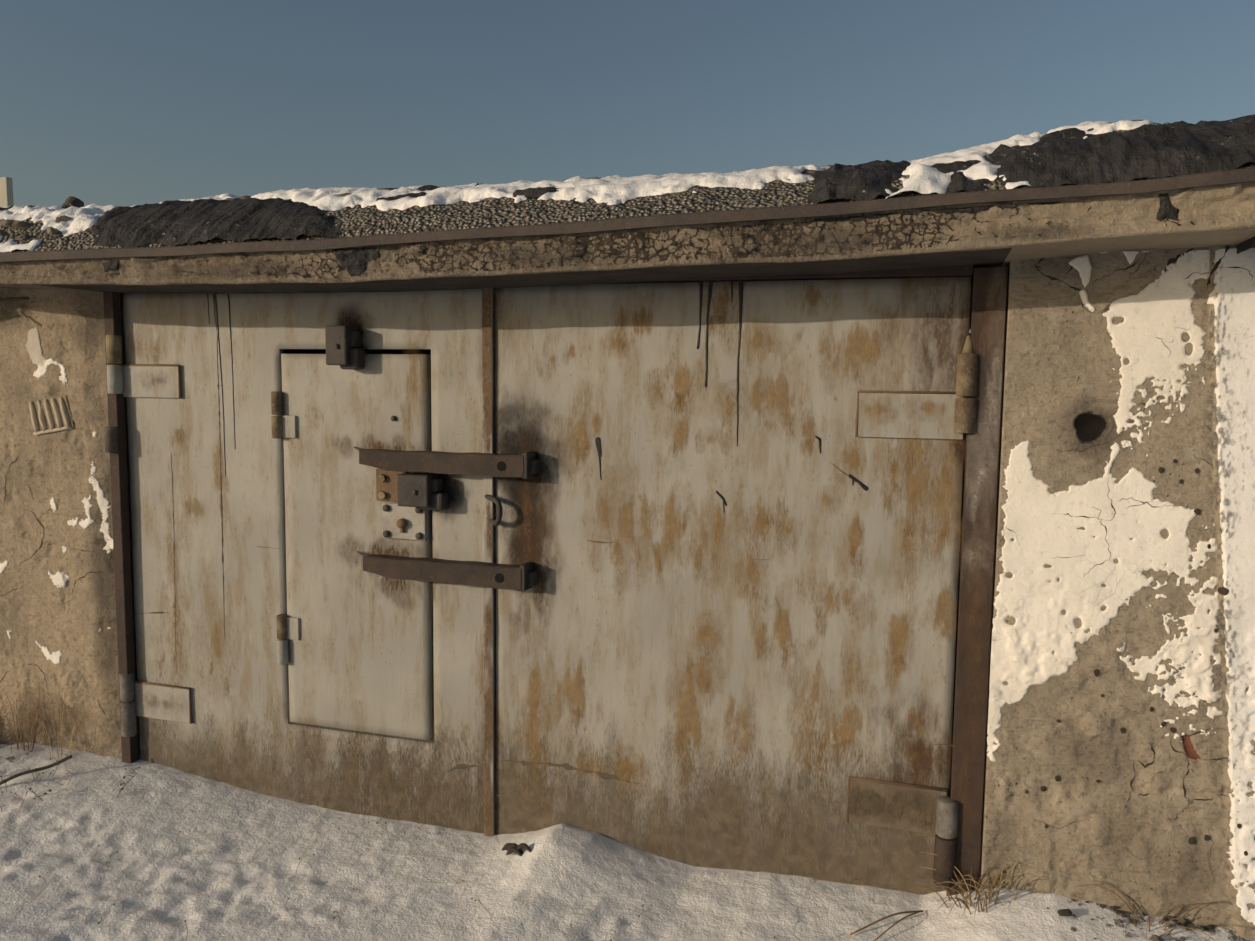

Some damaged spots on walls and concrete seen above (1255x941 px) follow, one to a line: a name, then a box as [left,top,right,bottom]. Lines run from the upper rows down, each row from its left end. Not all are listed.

crack [176,204,1253,314]
peeling [25,327,68,385]
corrosion [482,288,495,451]
corrosion [922,286,968,367]
crack [1,456,50,596]
peeling [48,569,70,588]
peeling [50,461,113,554]
corrosion [597,491,685,573]
peeling [986,250,1229,762]
peeling [35,640,62,666]
corrosion [479,602,493,836]
crack [1126,728,1231,883]